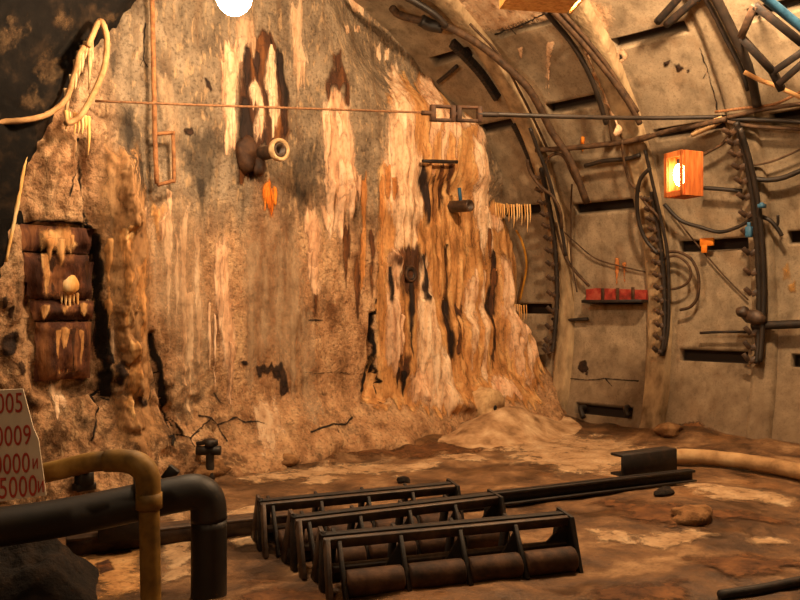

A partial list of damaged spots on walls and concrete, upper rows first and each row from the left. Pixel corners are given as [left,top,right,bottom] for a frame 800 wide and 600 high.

leakage [220,18,256,155]
leakage [250,44,280,138]
rust [418,163,455,224]
spalling [2,296,15,319]
spalling [1,331,25,375]
crack [147,333,265,447]
spalling [241,361,289,396]
crack [305,299,383,433]
rust [441,244,462,358]
rust [484,228,498,367]